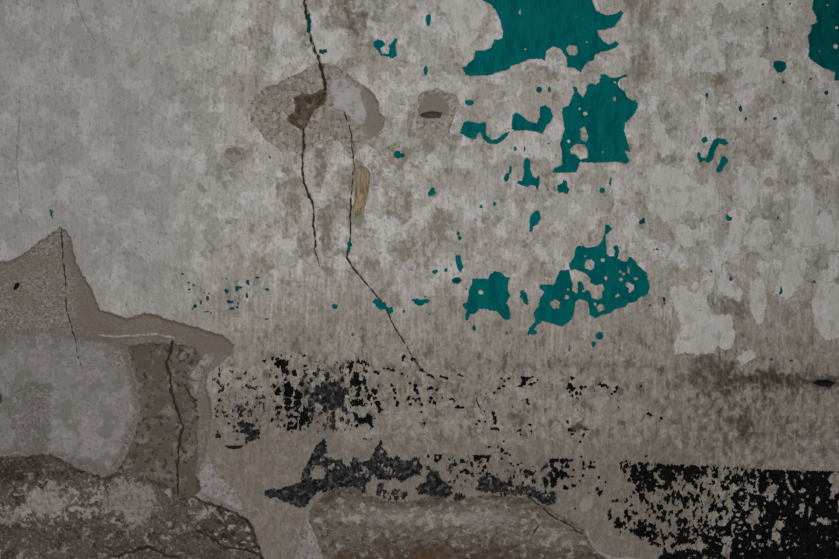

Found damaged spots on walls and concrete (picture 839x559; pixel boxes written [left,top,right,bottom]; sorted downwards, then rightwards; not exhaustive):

crack [303,0,327,91]
peeling [373,38,397,58]
peeling [433,0,623,76]
peeling [807,0,839,81]
flaking render [250,13,385,218]
peeling [416,66,638,194]
crack [301,128,320,266]
crack [344,112,432,377]
peeling [432,225,651,335]
crack [164,341,198,495]
flaking render [0,227,607,559]
peeling [607,454,839,559]